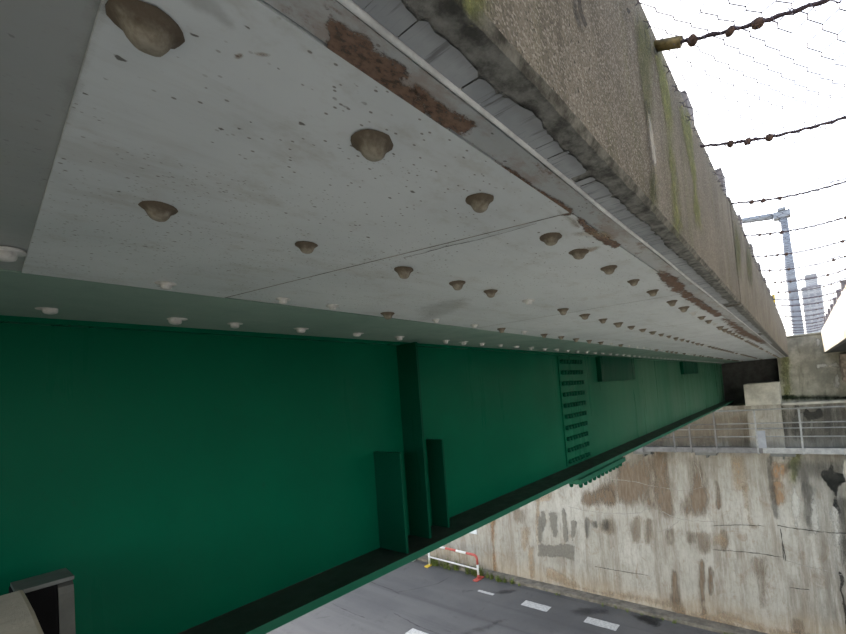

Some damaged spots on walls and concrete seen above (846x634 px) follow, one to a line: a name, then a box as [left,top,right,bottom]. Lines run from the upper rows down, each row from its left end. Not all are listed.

rust [326,9,476,135]
rust [657,271,765,344]
water stain [537,508,577,543]
water stain [631,517,651,543]
crack [714,525,846,561]
crack [838,572,846,624]